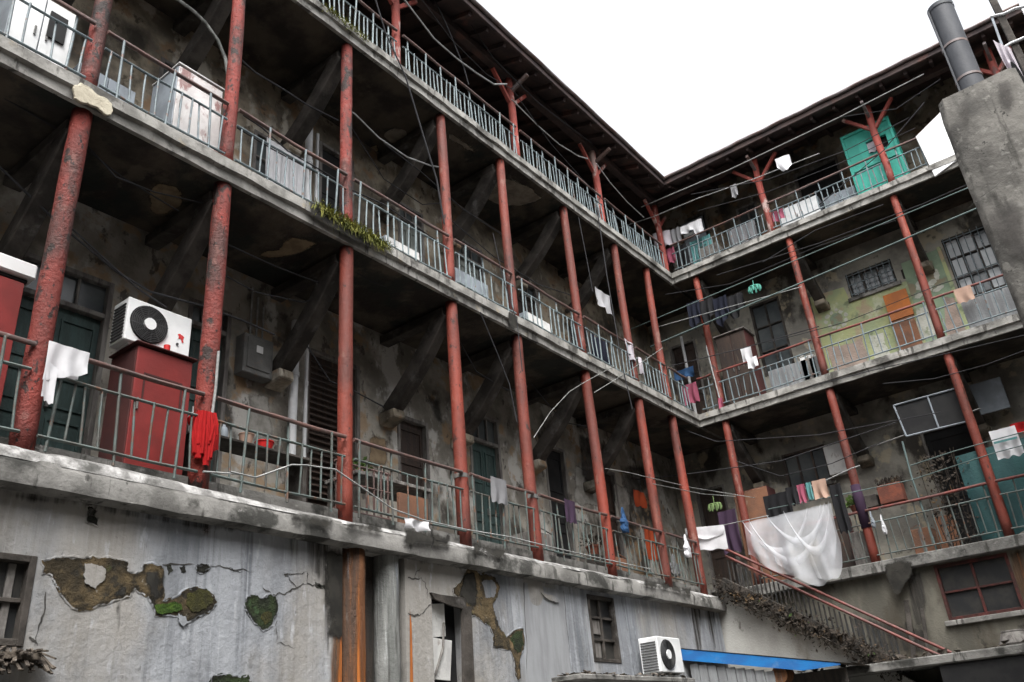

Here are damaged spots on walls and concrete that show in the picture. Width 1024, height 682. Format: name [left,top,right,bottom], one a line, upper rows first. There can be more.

water stain [292,514,332,528]
peeling [40,555,218,626]
crack [162,563,325,596]
corrosion [357,604,365,682]
peeling [452,569,526,682]